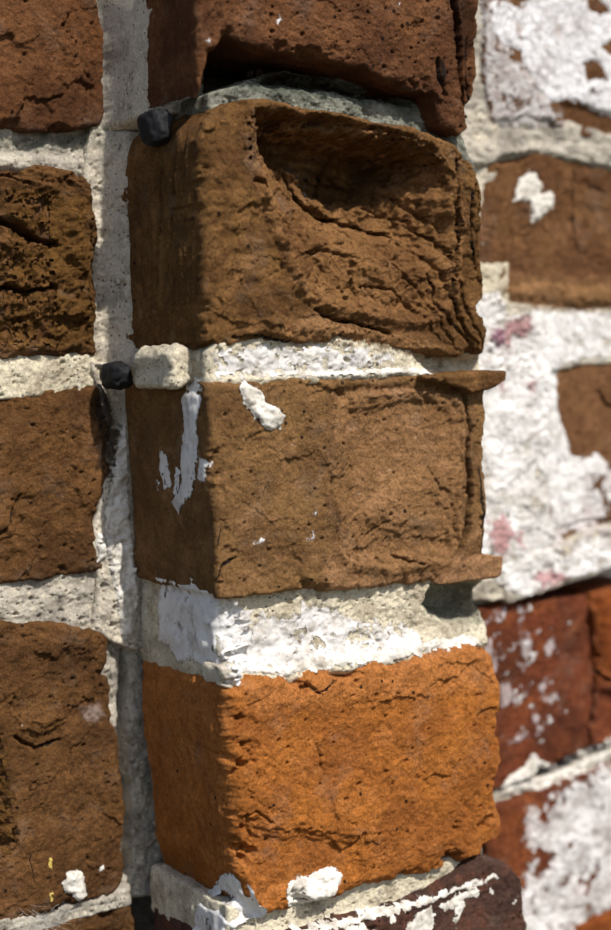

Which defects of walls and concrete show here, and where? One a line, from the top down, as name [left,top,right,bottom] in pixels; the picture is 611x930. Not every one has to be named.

peeling [478,0,611,131]
spalling [238,103,470,356]
spalling [320,273,611,672]
peeling [500,676,559,745]
peeling [192,873,267,930]
peeling [499,738,611,930]